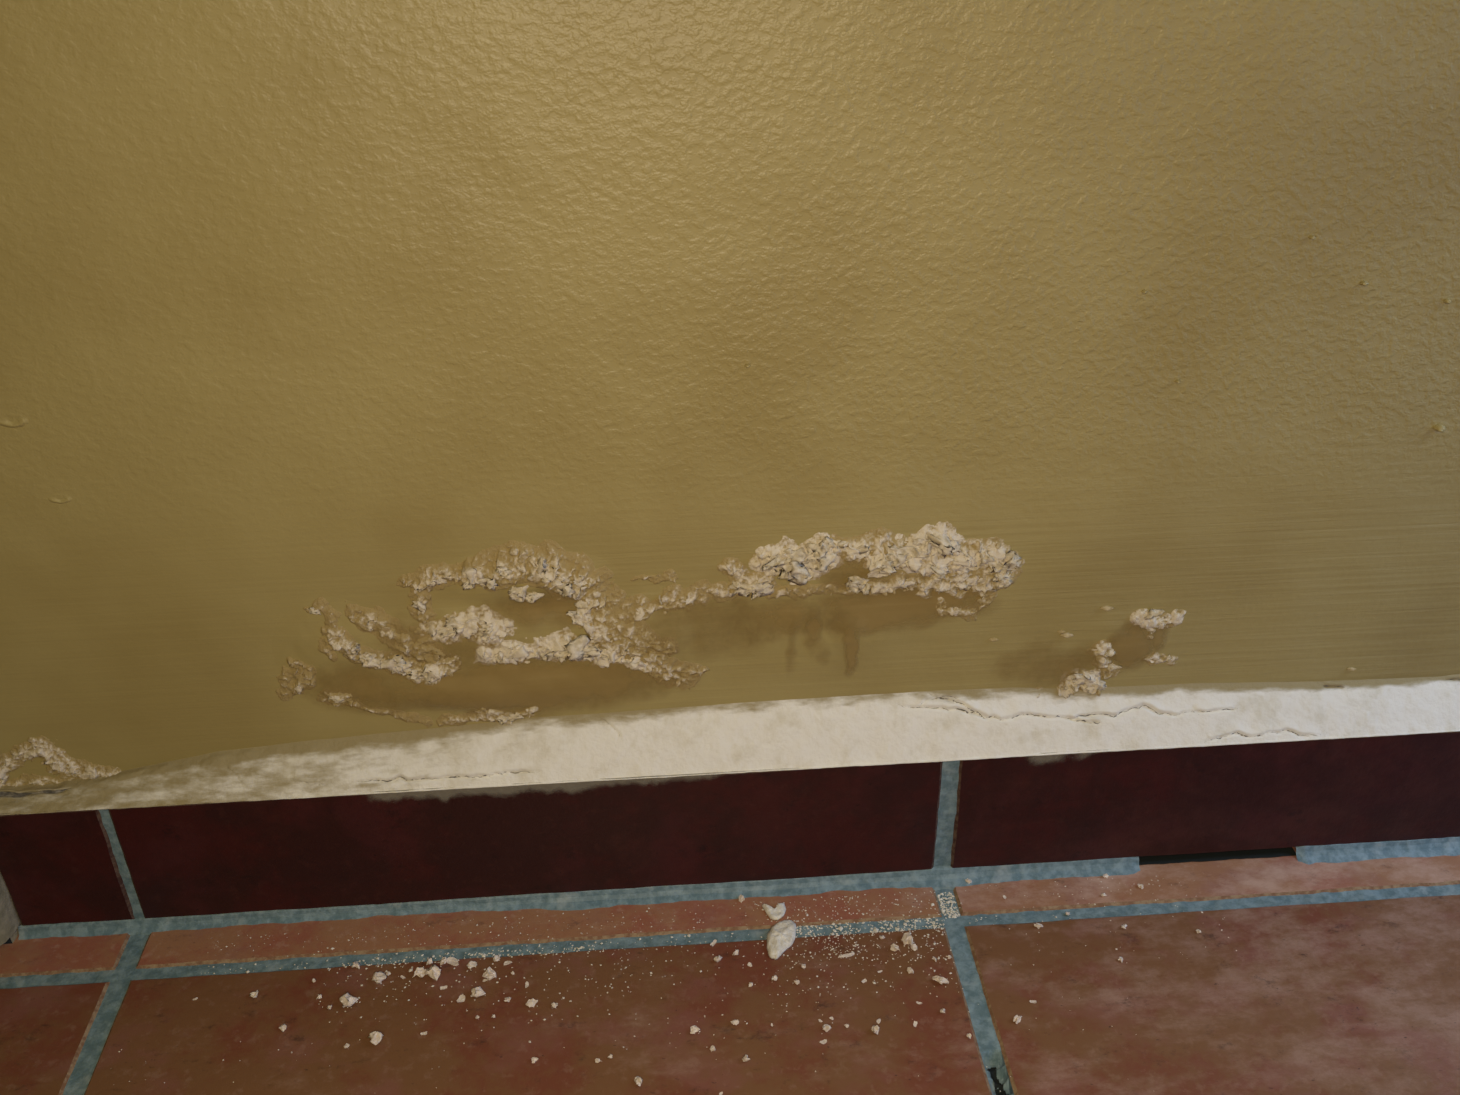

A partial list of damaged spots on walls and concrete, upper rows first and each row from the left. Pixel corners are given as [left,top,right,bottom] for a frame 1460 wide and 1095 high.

peeling [272,521,1026,728]
peeling [1035,607,1186,699]
crack [902,694,1316,739]
peeling [0,735,121,797]